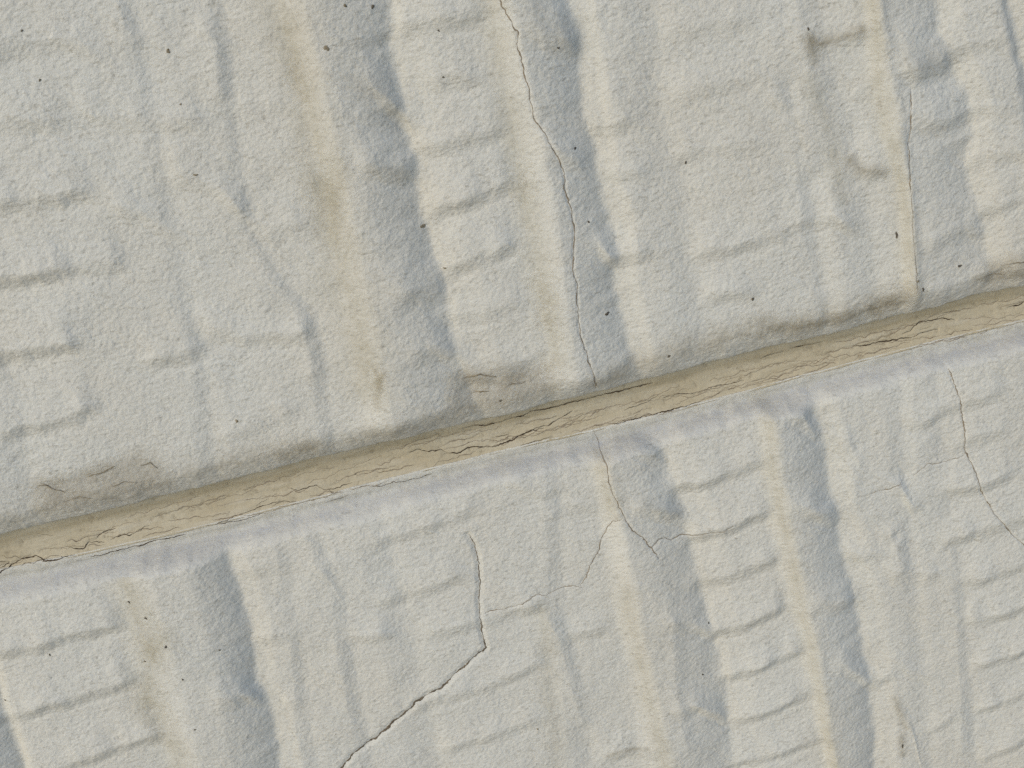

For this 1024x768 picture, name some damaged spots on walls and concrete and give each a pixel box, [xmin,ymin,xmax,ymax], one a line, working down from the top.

crack [499,0,597,387]
crack [0,295,1024,768]